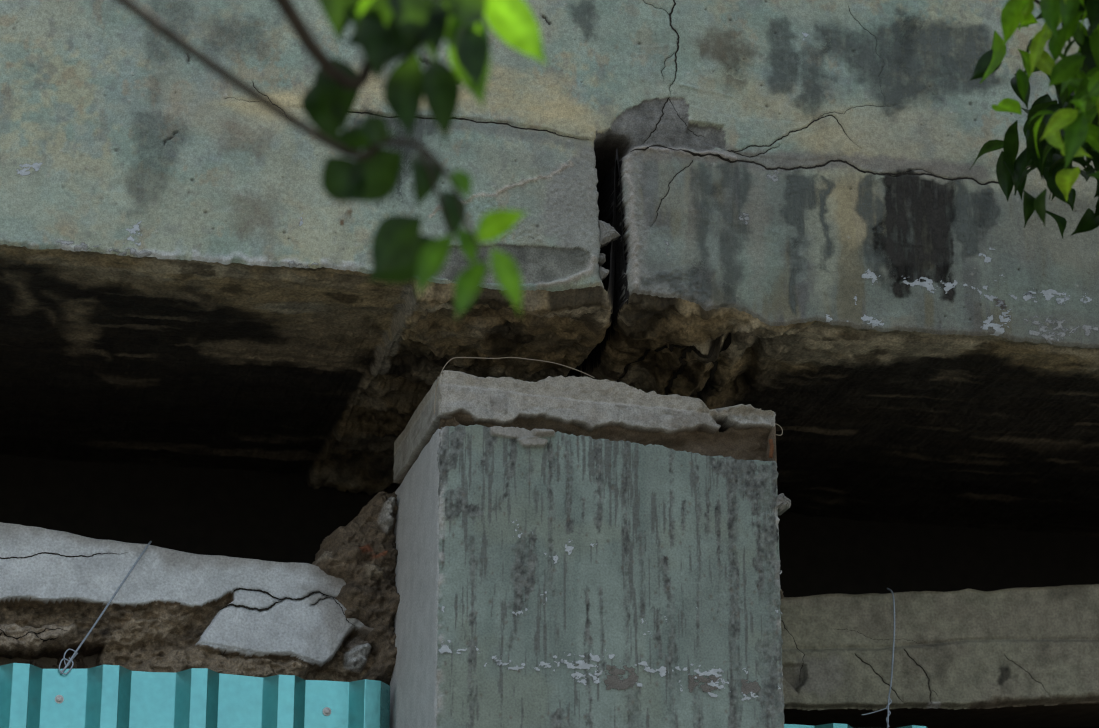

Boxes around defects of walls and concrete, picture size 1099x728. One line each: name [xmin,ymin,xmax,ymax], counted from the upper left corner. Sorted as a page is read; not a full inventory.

crack [351,111,589,140]
crack [567,0,999,397]
spalling [436,244,594,284]
peeling [862,269,880,285]
water stain [857,169,999,301]
peeling [901,248,1098,344]
crack [439,411,777,470]
crack [0,628,67,642]
crack [0,551,124,559]
crack [219,588,353,625]
peeling [437,427,784,728]
crack [837,629,938,706]